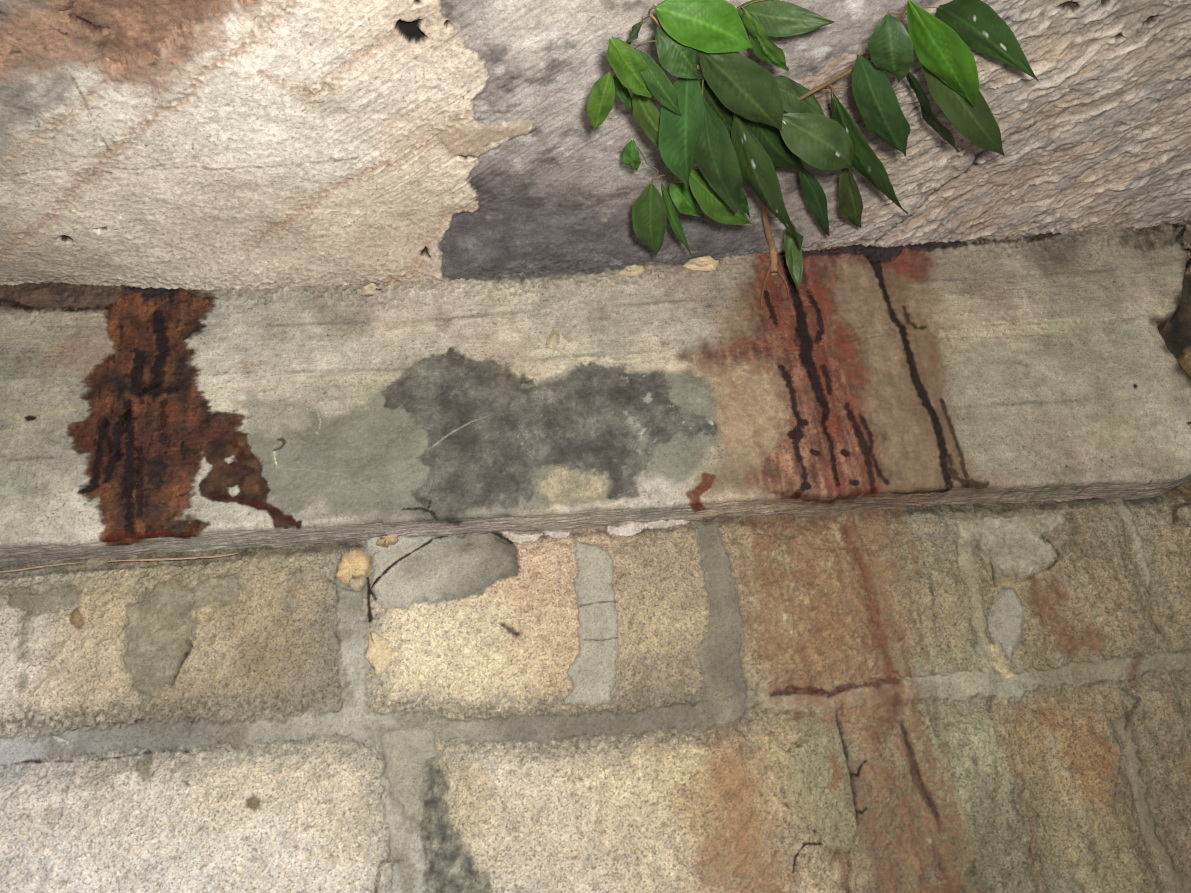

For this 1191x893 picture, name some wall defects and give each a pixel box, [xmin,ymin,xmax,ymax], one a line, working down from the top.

spalling [395,19,426,43]
peeling [421,0,871,280]
peeling [725,0,947,84]
spalling [1057,1,1080,10]
corrosion [67,286,302,546]
leakage [247,252,812,526]
leakage [607,519,690,537]
corrosion [687,473,715,512]
corrosion [704,247,889,503]
leakage [802,241,989,499]
leakage [1151,270,1191,382]
corrosion [773,530,901,727]